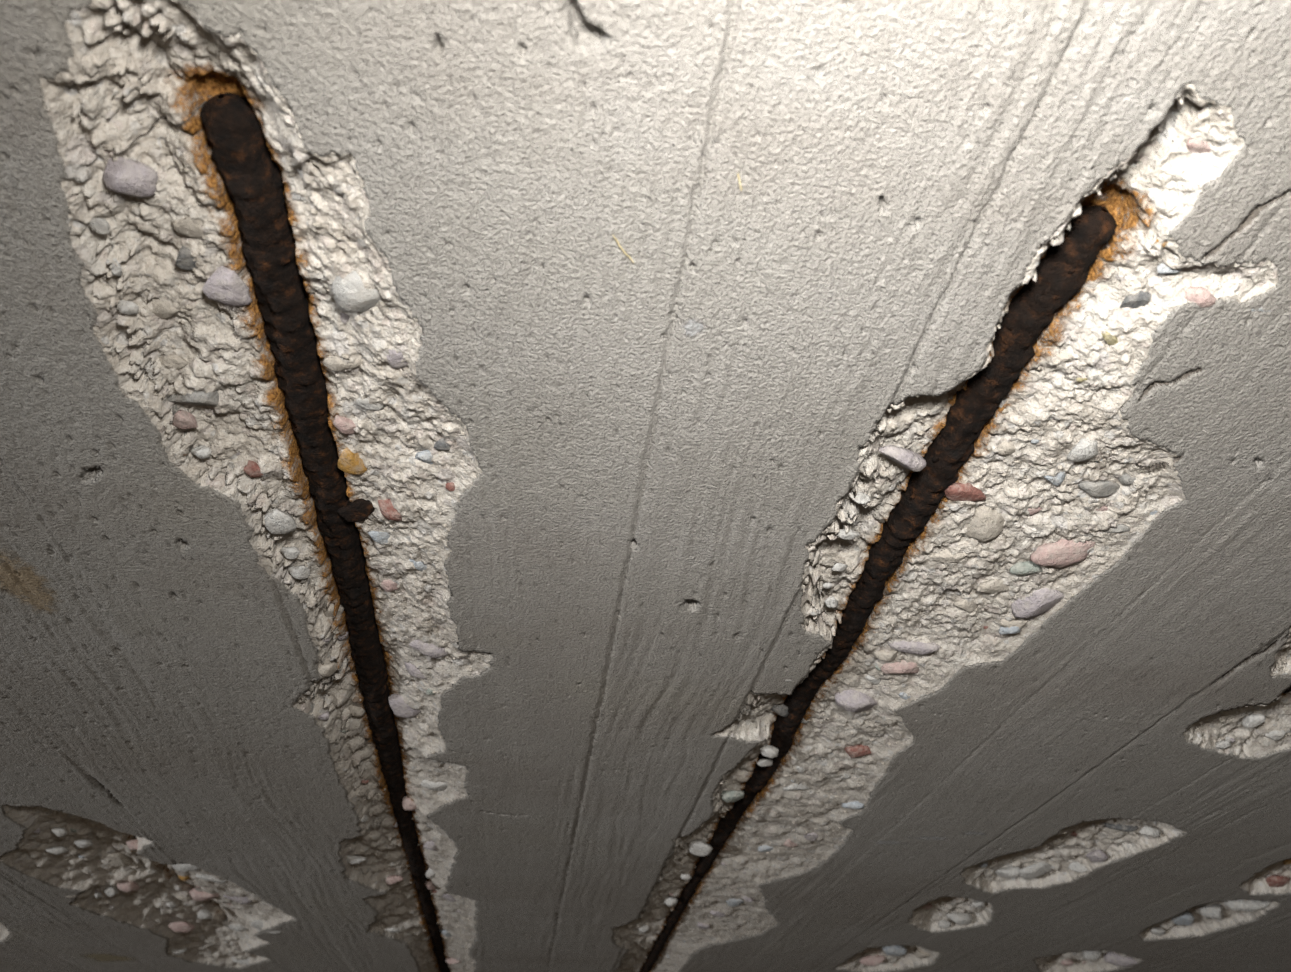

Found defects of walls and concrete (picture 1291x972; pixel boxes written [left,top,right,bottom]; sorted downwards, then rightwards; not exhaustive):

spalling [0,0,494,972]
rust [200,92,450,972]
rust [640,205,1117,972]
spalling [614,84,1291,972]
crack [1139,368,1202,401]
crack [1202,189,1291,259]